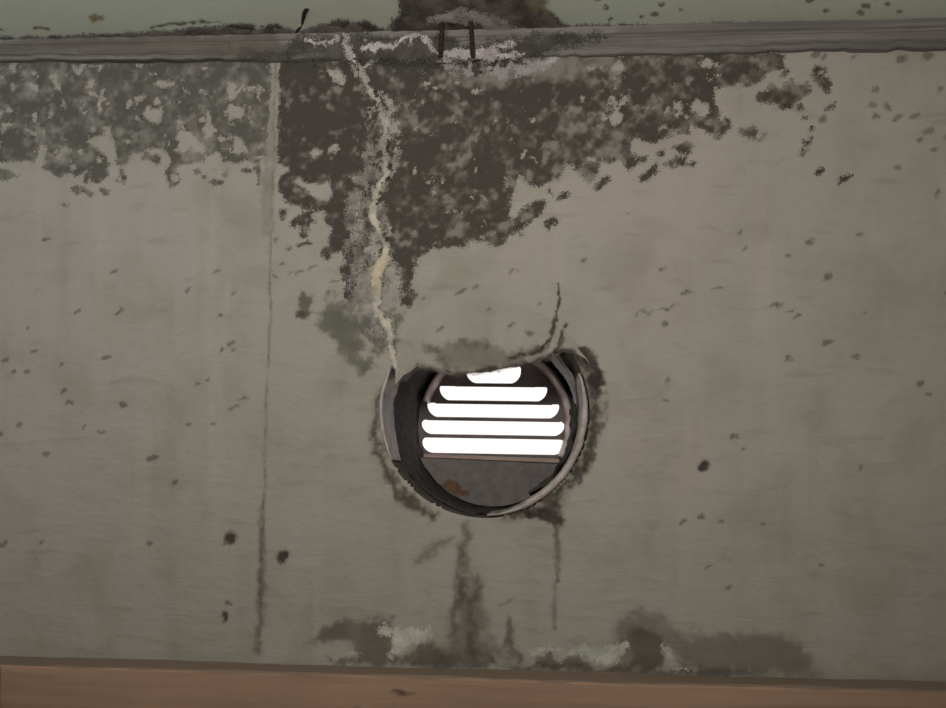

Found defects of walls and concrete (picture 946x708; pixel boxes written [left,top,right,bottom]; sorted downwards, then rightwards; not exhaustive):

damp [227,0,609,69]
crack [304,32,422,372]
damp [296,293,311,317]
damp [321,303,385,372]
crack [509,283,567,359]
efflorescence [375,621,433,662]
efflorescence [527,640,633,668]
efflorescence [660,639,688,673]